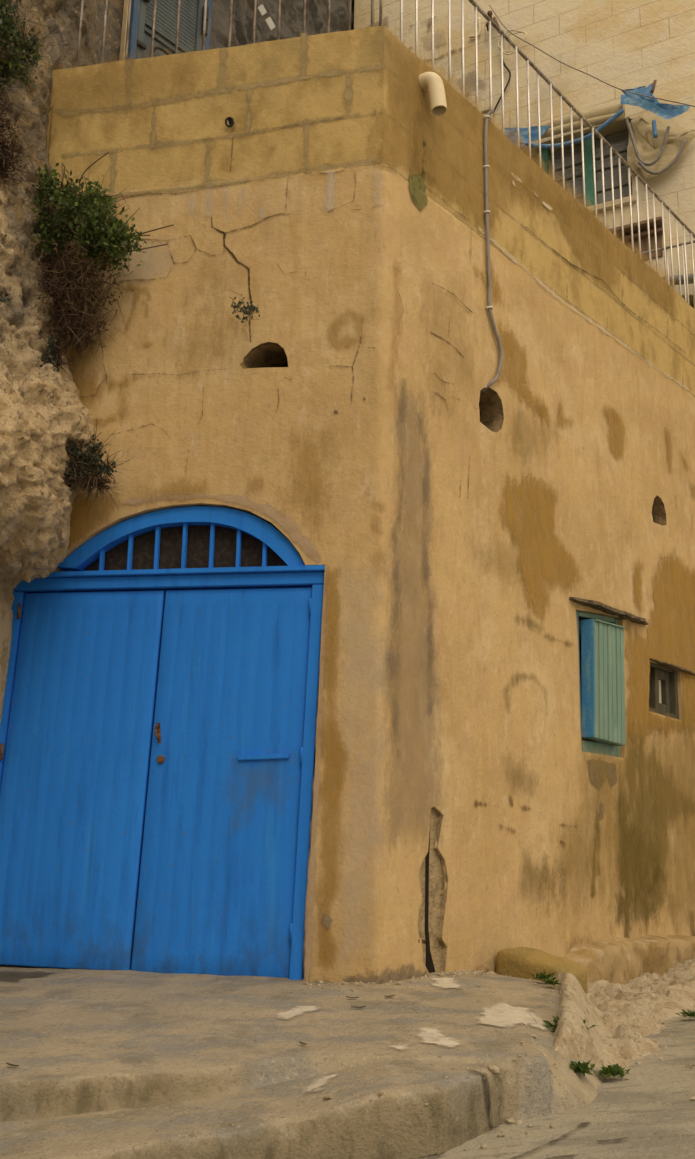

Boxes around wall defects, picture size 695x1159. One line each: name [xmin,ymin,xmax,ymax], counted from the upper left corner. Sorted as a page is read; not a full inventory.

crack [113,117,472,342]
water stain [605,409,625,458]
water stain [502,474,579,615]
water stain [325,572,339,689]
water stain [564,556,695,938]
water stain [319,722,346,964]
crack [417,805,449,975]
water stain [0,971,53,982]